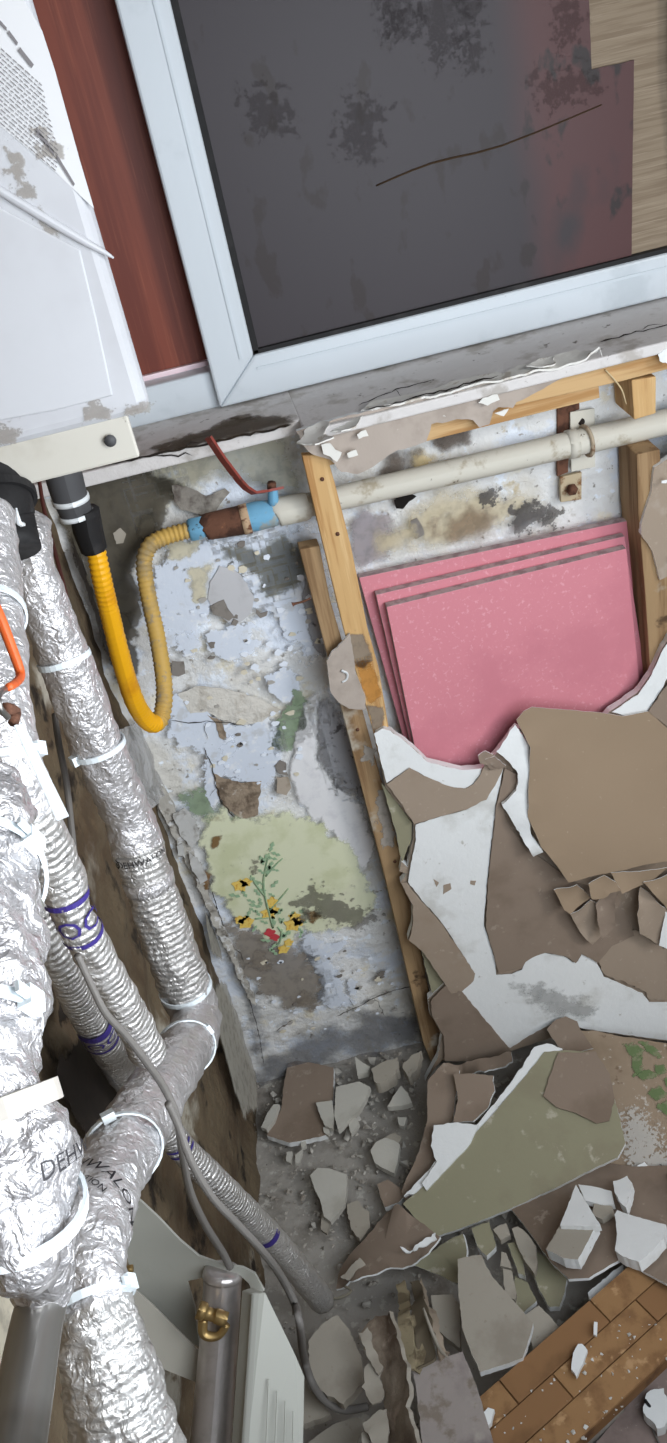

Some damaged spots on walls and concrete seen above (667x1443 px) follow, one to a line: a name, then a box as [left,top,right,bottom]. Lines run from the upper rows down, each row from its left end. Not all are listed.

peeling [297,347,602,462]
spalling [394,494,416,509]
damp [351,486,565,566]
peeling [154,524,340,819]
flaking render [157,783,398,1033]
spalling [476,1043,563,1132]
spalling [404,1161,437,1198]